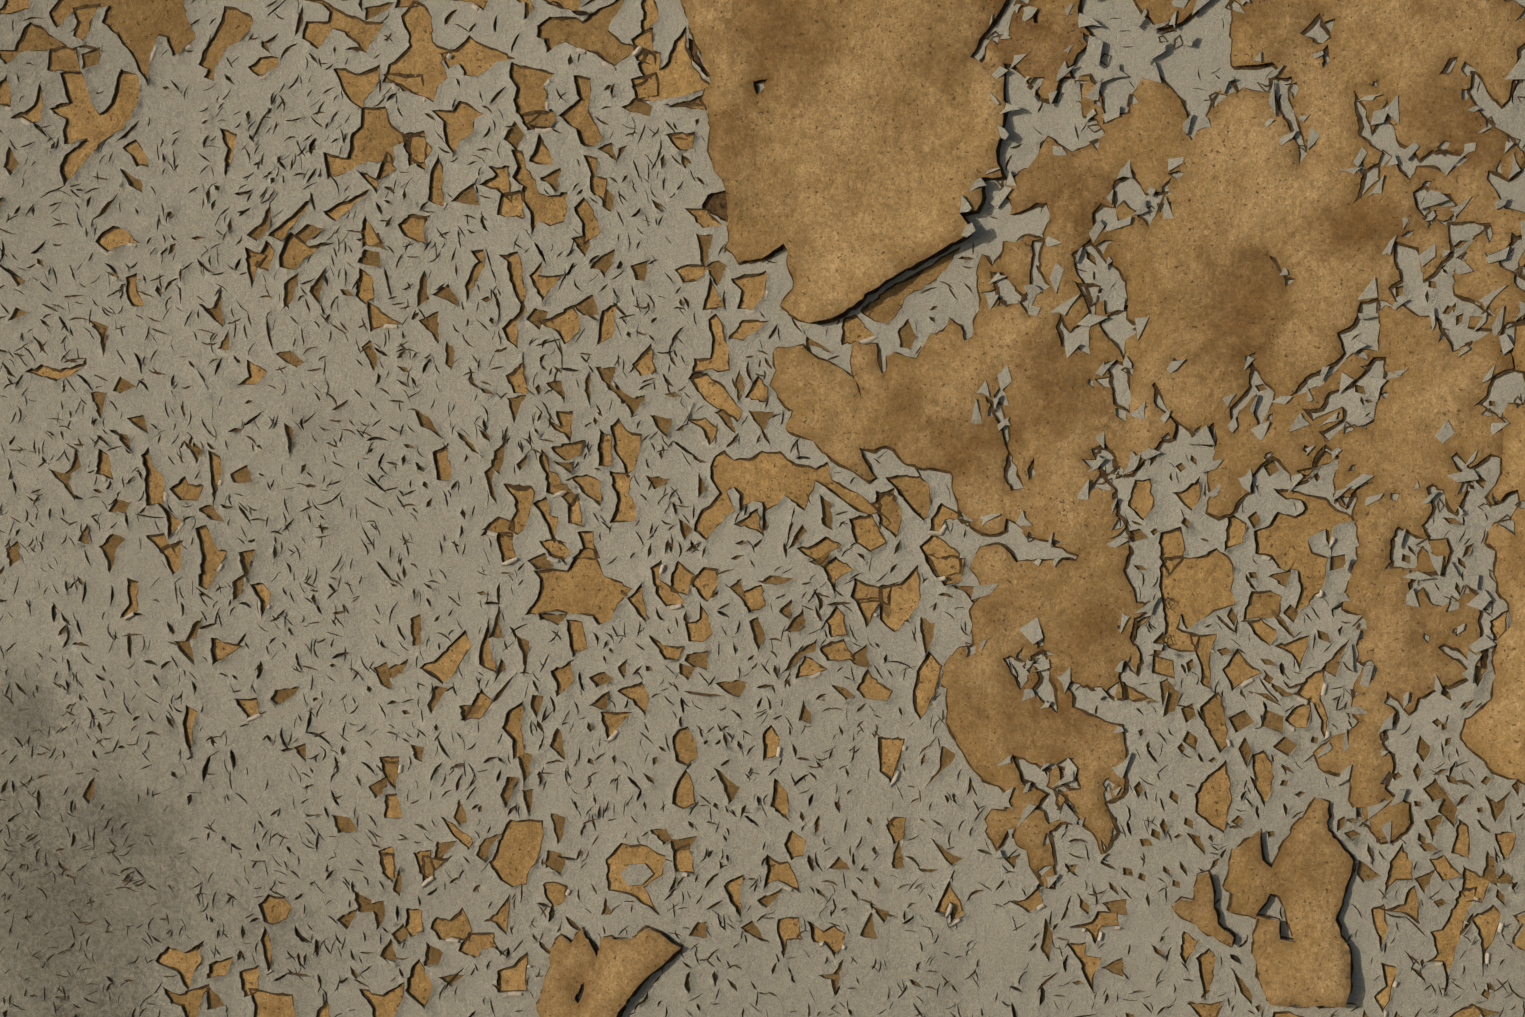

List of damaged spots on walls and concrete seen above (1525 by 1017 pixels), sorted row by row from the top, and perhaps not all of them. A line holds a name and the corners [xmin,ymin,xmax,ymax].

peeling [0,0,278,201]
peeling [95,197,161,307]
peeling [246,195,327,308]
peeling [4,308,108,381]
peeling [402,411,451,507]
peeling [480,0,1525,1017]
peeling [172,619,243,664]
peeling [235,686,300,722]
peeling [368,606,529,730]
peeling [156,894,295,1017]
peeling [338,891,385,929]
peeling [360,695,583,1017]